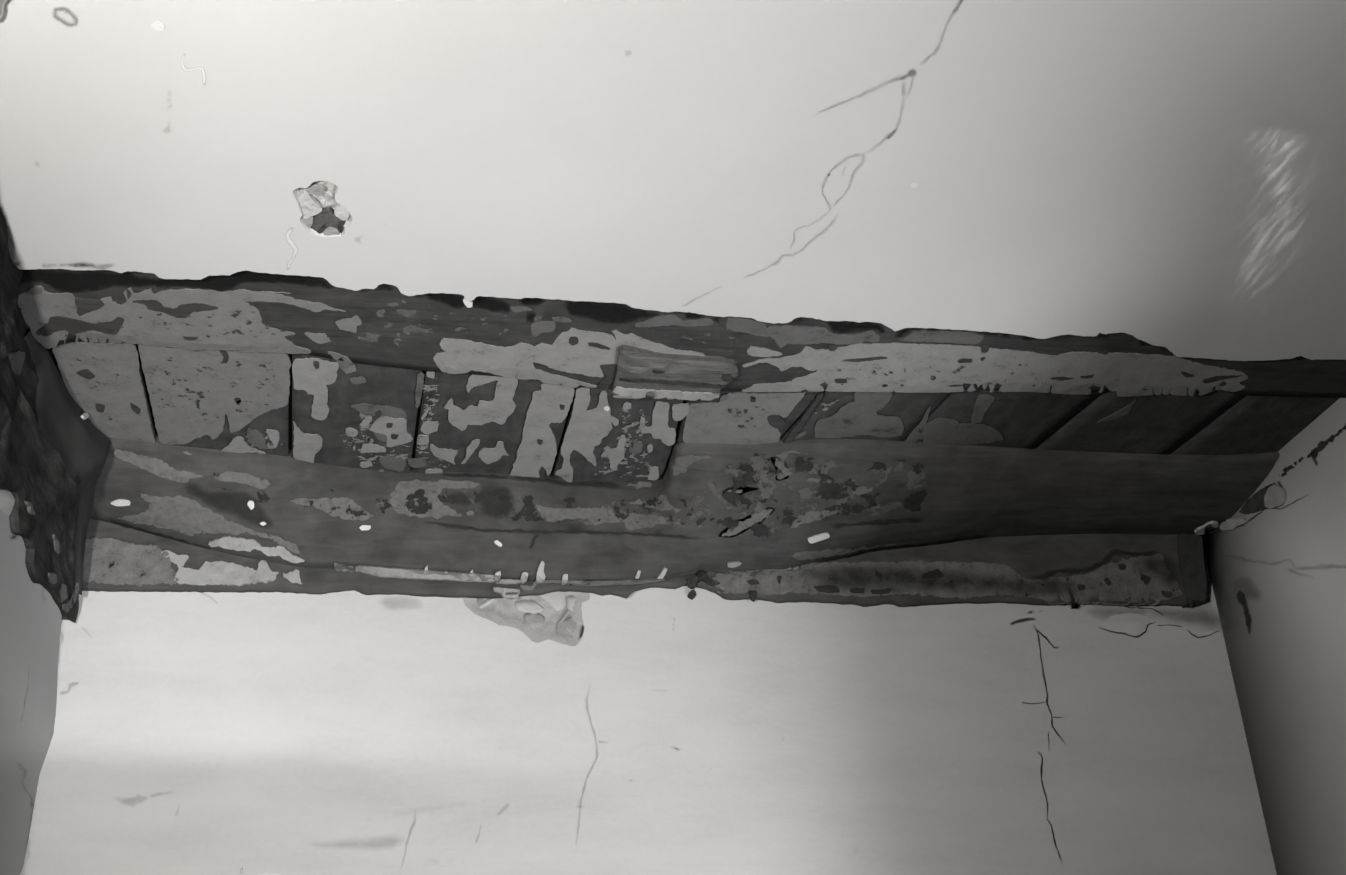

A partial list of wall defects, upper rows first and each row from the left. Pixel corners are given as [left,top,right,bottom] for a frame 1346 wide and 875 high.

spalling [293,181,352,237]
peeling [0,206,1248,554]
peeling [791,536,982,562]
spalling [462,591,590,646]
spalling [686,569,720,600]
spalling [747,579,759,602]
spalling [1067,579,1085,609]
crack [1011,618,1062,859]